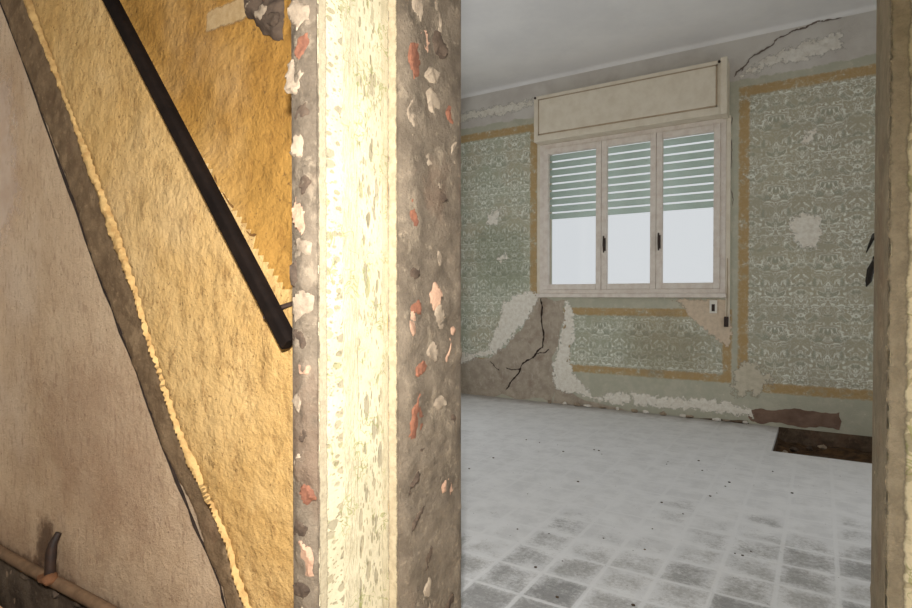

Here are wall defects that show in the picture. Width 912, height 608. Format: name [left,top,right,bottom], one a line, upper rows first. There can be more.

spalling [23,0,252,608]
flaking render [243,0,320,608]
crack [490,299,549,389]
flaking render [397,0,649,608]
spalling [679,414,749,424]
crack [734,17,842,77]
peeling [739,29,848,79]
flaking render [773,0,912,608]